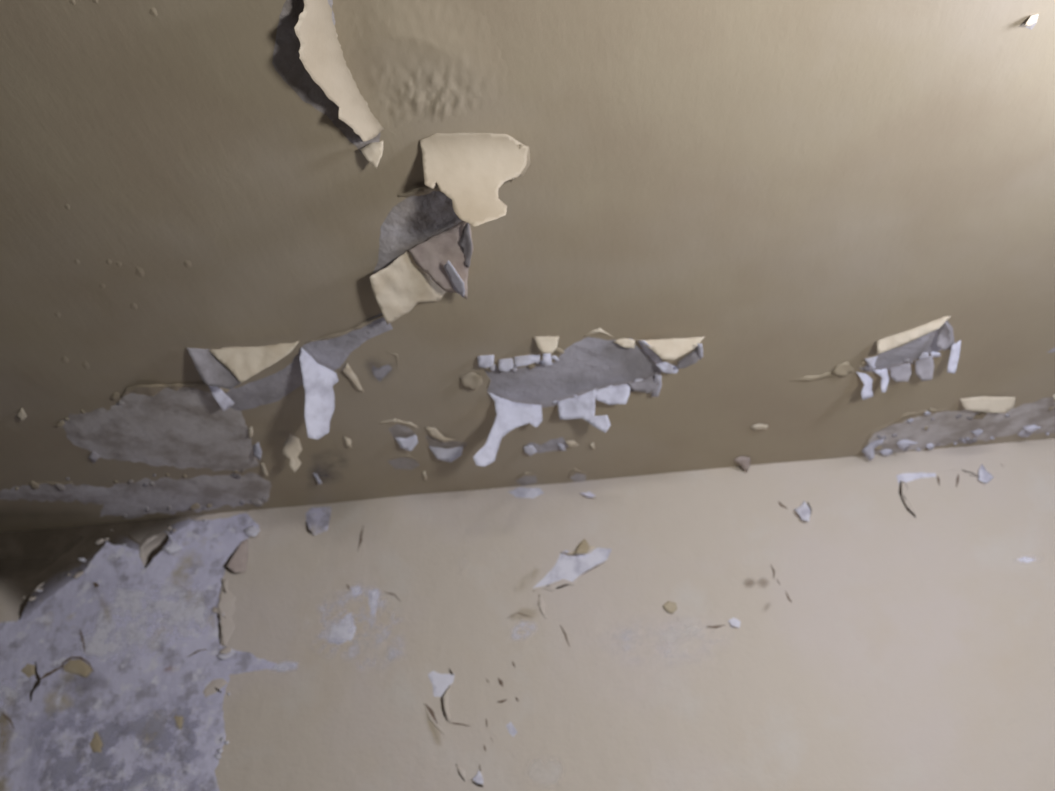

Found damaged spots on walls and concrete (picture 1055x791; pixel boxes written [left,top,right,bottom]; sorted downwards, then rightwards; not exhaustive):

peeling [1025,14,1039,30]
peeling [272,0,385,169]
peeling [0,133,530,791]
flaking render [509,472,544,499]
peeling [380,328,704,467]
peeling [791,316,961,400]
peeling [861,395,1055,461]
flaking render [508,539,612,638]